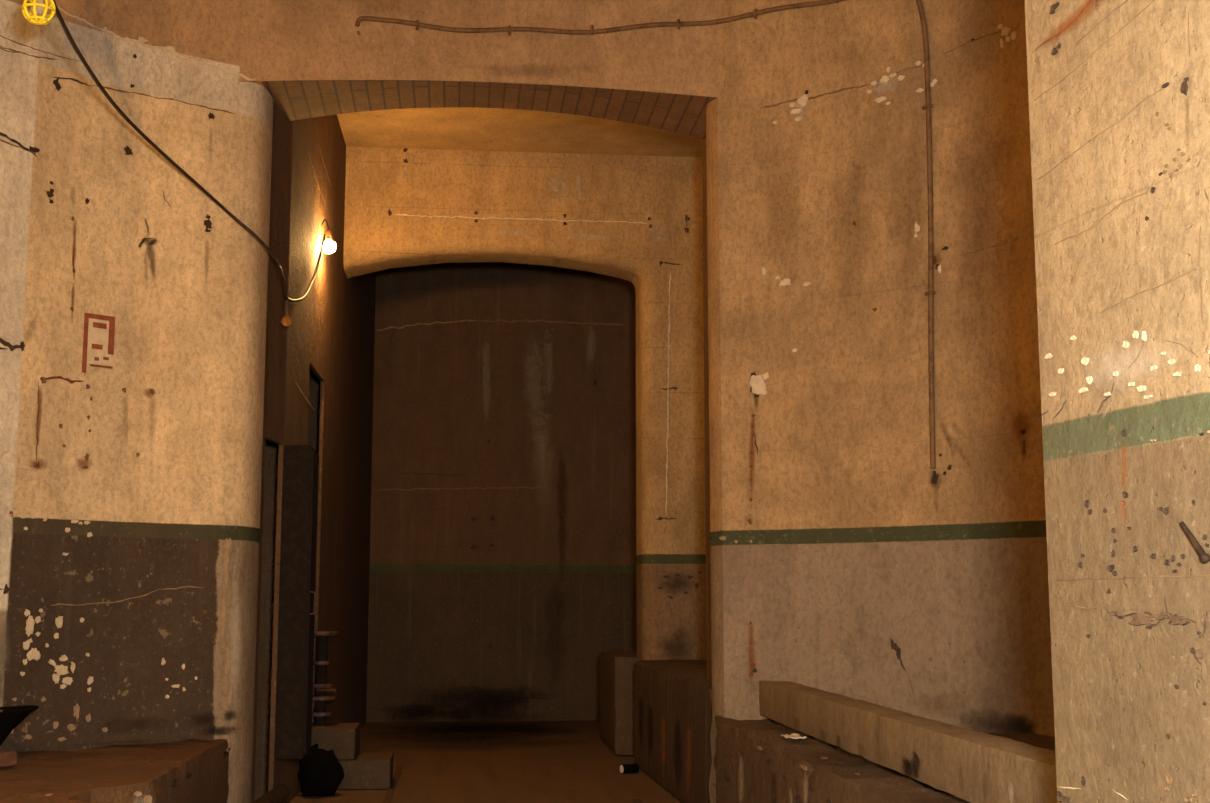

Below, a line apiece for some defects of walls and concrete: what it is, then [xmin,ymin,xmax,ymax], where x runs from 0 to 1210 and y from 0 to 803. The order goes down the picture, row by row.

rust [1034,0,1098,51]
peeling [1122,330,1147,349]
peeling [1079,357,1093,393]
peeling [1113,371,1153,399]
peeling [1150,351,1201,376]
peeling [20,609,94,692]
peeling [53,703,108,742]